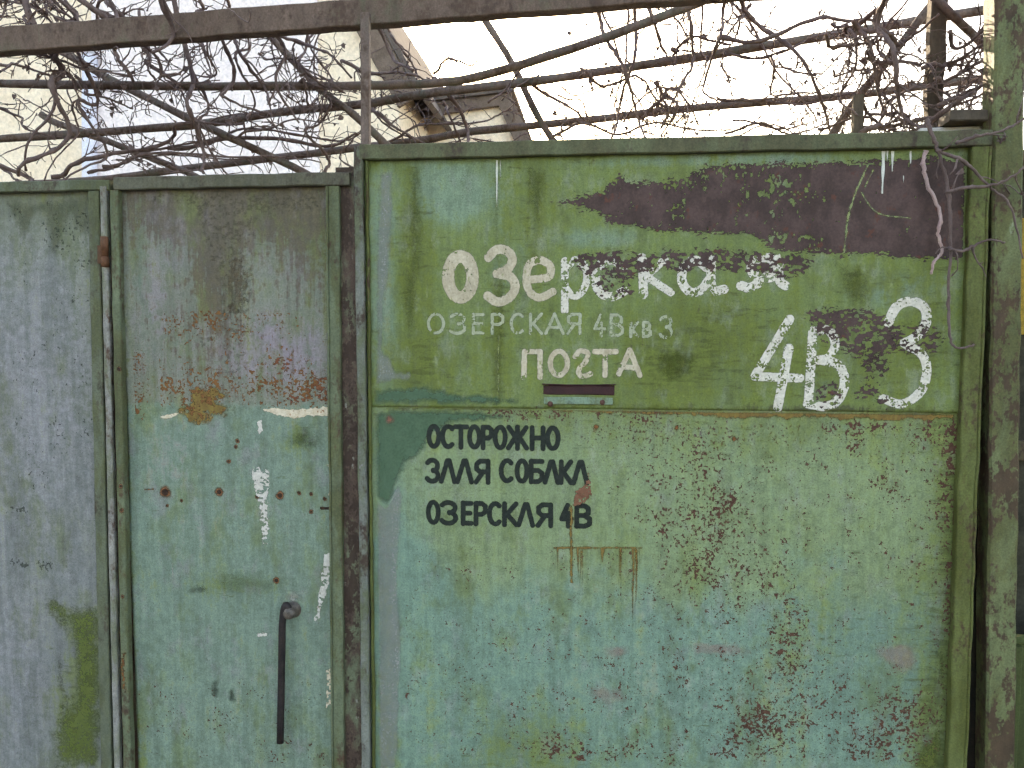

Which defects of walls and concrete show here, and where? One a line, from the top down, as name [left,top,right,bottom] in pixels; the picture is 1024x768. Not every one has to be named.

peeling [557,153,965,298]
rust [178,383,227,425]
rust [283,377,327,404]
rust [589,411,954,430]
rust [145,486,183,507]
peeling [252,467,270,544]
rust [554,473,642,613]
peeling [430,306,957,766]
peeling [314,553,330,621]